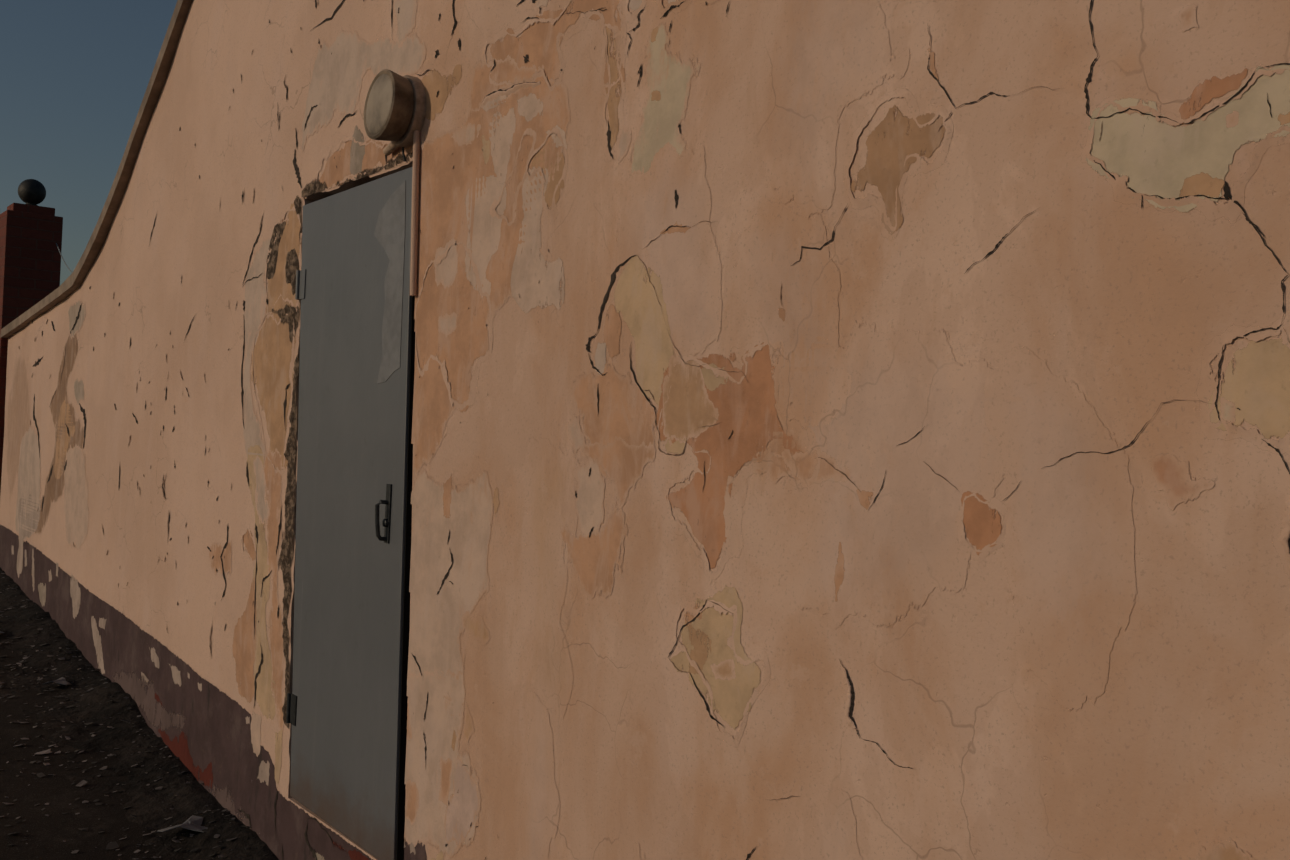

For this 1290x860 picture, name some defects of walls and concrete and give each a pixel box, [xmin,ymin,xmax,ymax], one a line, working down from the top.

crack [313,0,344,29]
peeling [843,87,954,240]
peeling [1081,60,1290,224]
crack [1225,184,1289,319]
peeling [232,0,729,860]
peeling [11,545,58,606]
peeling [655,333,886,748]
peeling [928,465,1019,562]
crack [1262,439,1290,579]
peeling [91,616,252,829]
peeling [157,815,208,833]